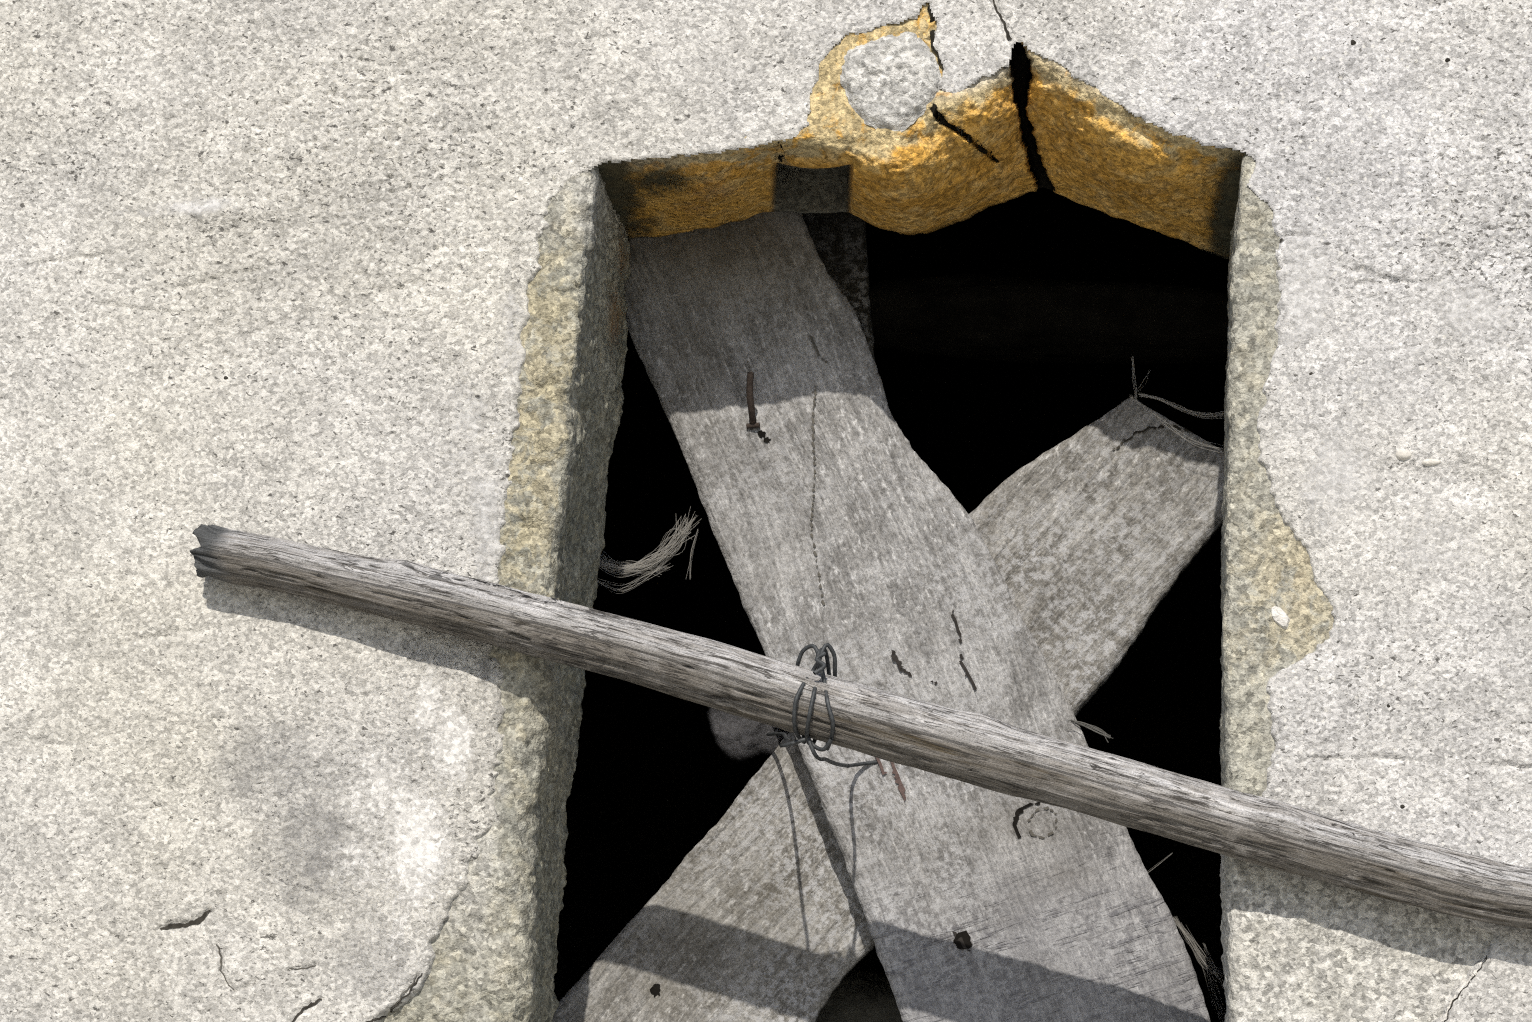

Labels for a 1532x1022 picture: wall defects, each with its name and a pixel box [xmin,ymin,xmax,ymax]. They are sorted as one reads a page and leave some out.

spalling [796,2,1011,139]
crack [927,0,1055,191]
peeling [498,170,591,597]
peeling [1227,155,1333,797]
damp [309,667,478,960]
peeling [380,646,540,1022]
crack [160,910,234,990]
crack [287,965,322,1022]
crack [366,973,423,1022]
crack [1442,956,1487,1022]